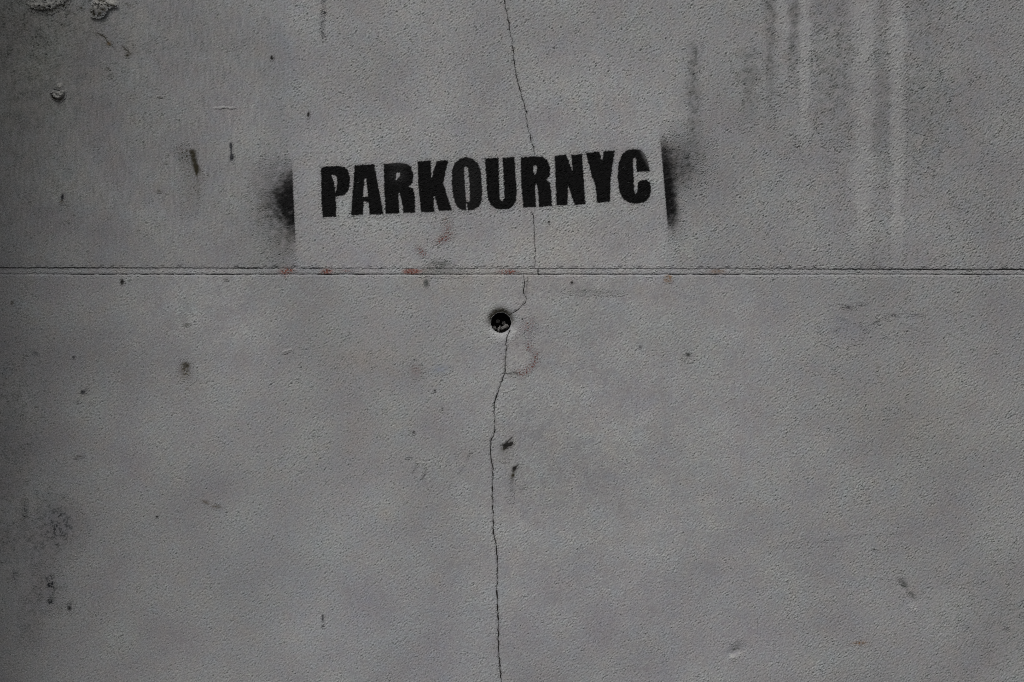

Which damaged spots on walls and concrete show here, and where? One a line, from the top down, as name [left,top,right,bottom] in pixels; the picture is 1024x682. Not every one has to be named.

crack [503,0,535,167]
crack [457,209,541,682]